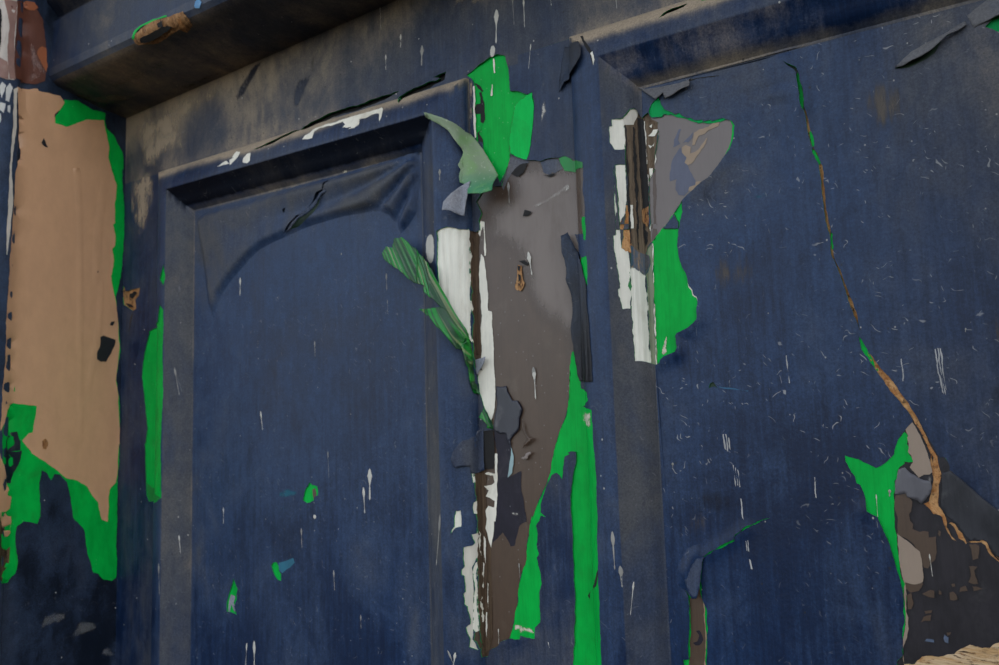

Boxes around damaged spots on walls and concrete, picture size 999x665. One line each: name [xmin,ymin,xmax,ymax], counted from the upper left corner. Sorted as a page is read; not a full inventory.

spalling [132,11,193,45]
peeling [967,0,999,32]
peeling [0,0,140,583]
peeling [143,306,163,503]
peeling [382,55,601,665]
peeling [609,75,735,365]
crack [785,63,999,561]
peeling [845,420,999,665]